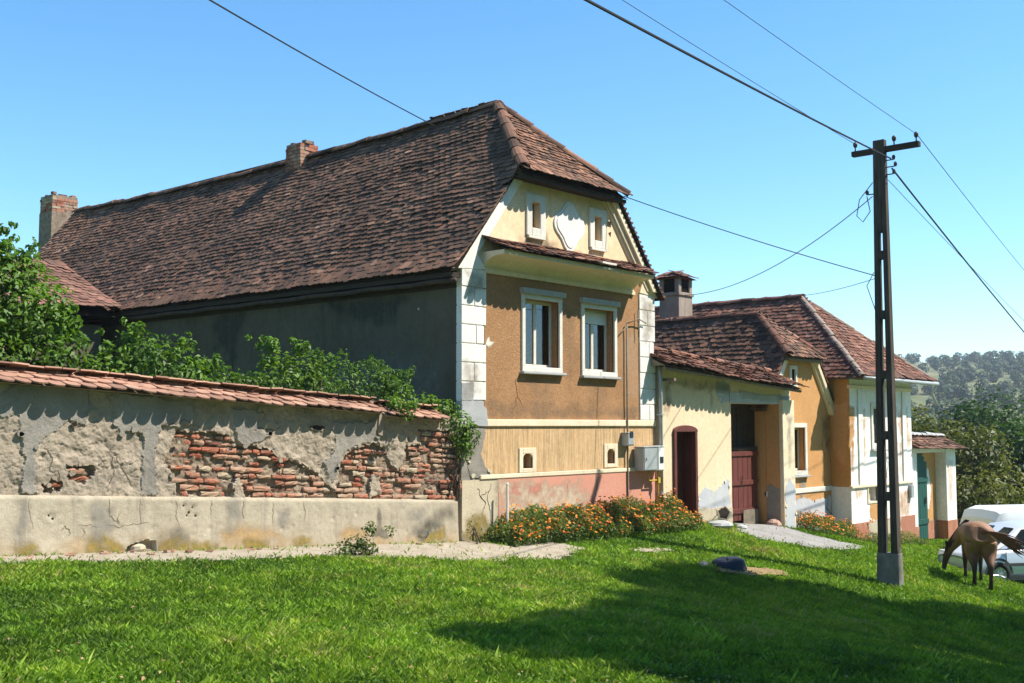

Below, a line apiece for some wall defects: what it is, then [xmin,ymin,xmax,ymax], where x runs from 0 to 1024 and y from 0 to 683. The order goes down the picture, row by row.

peeling [0,384,96,494]
crack [62,438,180,538]
flaking render [111,392,492,517]
peeling [698,479,732,521]